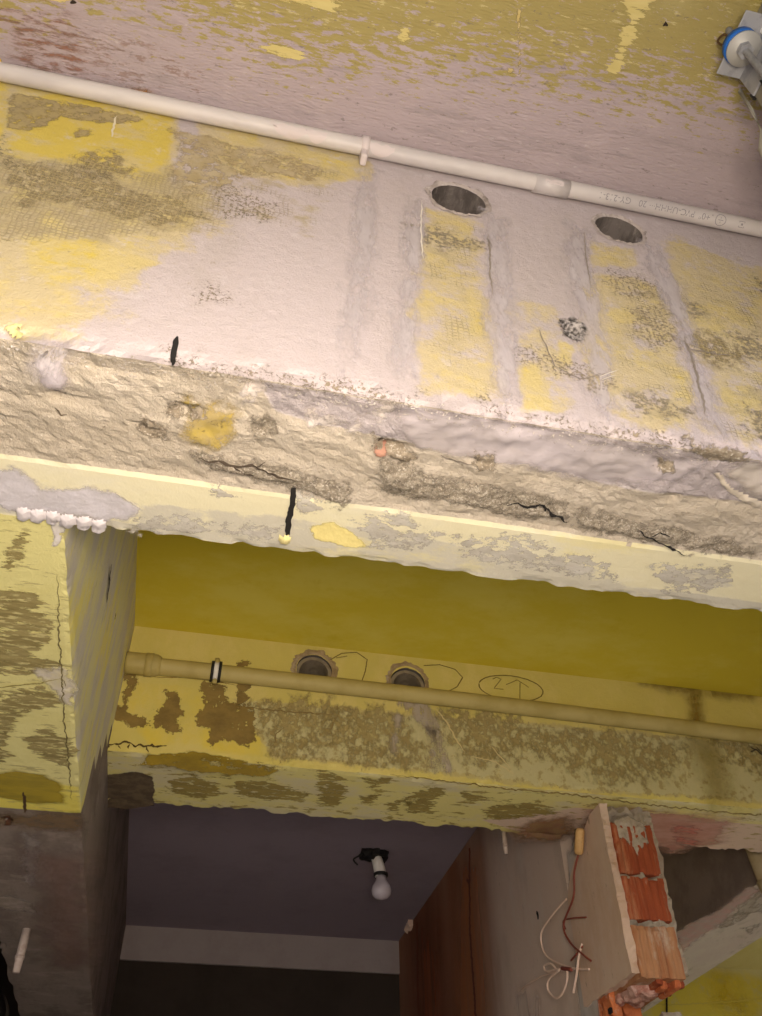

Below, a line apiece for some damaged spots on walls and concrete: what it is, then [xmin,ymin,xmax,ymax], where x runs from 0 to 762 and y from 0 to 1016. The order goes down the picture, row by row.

spalling [136,419,169,440]
spalling [473,393,750,474]
peeling [1,532,32,569]
crack [200,458,296,536]
spalling [189,450,353,510]
crack [507,503,567,523]
spalling [371,432,755,556]
crack [640,531,685,556]
peeling [0,587,80,767]
crack [108,741,167,752]
peeling [108,673,445,814]
peeling [436,708,688,786]